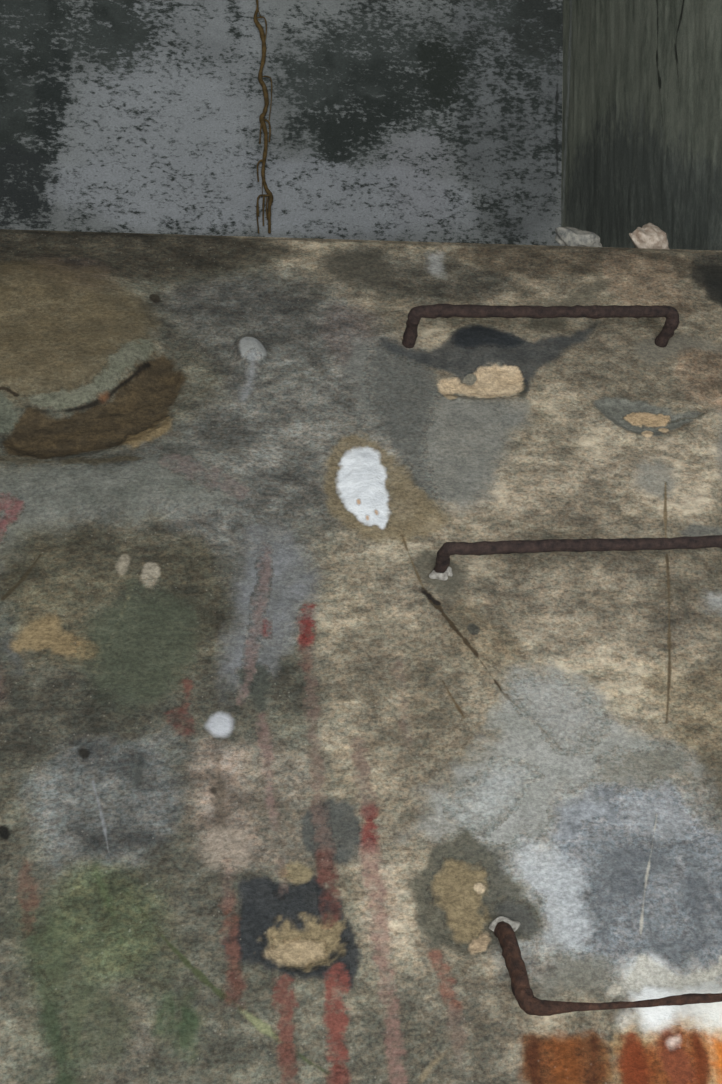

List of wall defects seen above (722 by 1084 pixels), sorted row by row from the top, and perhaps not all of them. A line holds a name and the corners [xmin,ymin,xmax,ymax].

damp [0,0,183,231]
damp [262,0,563,164]
damp [561,83,722,319]
peeling [0,351,190,468]
damp [335,273,617,523]
spalling [435,362,527,401]
spalling [590,395,707,439]
damp [630,330,722,369]
damp [695,585,722,620]
spalling [191,815,365,990]
spalling [400,826,548,971]
rust [512,1007,722,1084]